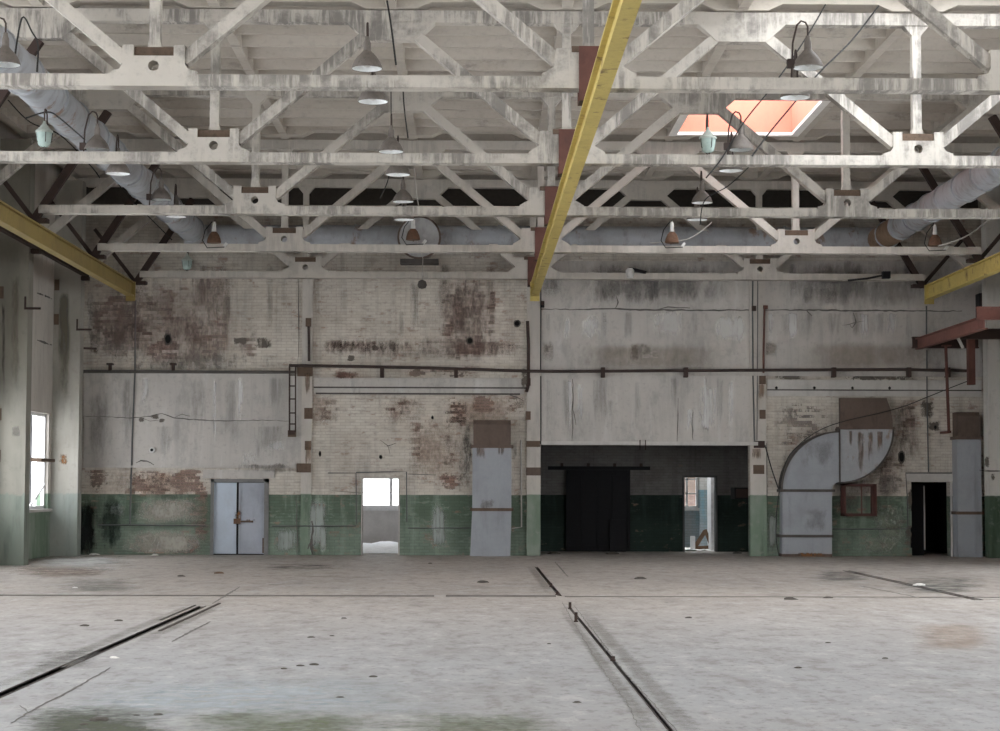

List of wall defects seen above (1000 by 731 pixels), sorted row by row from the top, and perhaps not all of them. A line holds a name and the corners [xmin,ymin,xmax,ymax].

peeling [93,296,176,359]
peeling [409,292,495,377]
peeling [445,397,494,424]
corrosion [850,431,883,469]
peeling [90,470,108,490]
peeling [440,473,461,490]
leakage [81,502,120,554]
peeling [132,470,204,553]